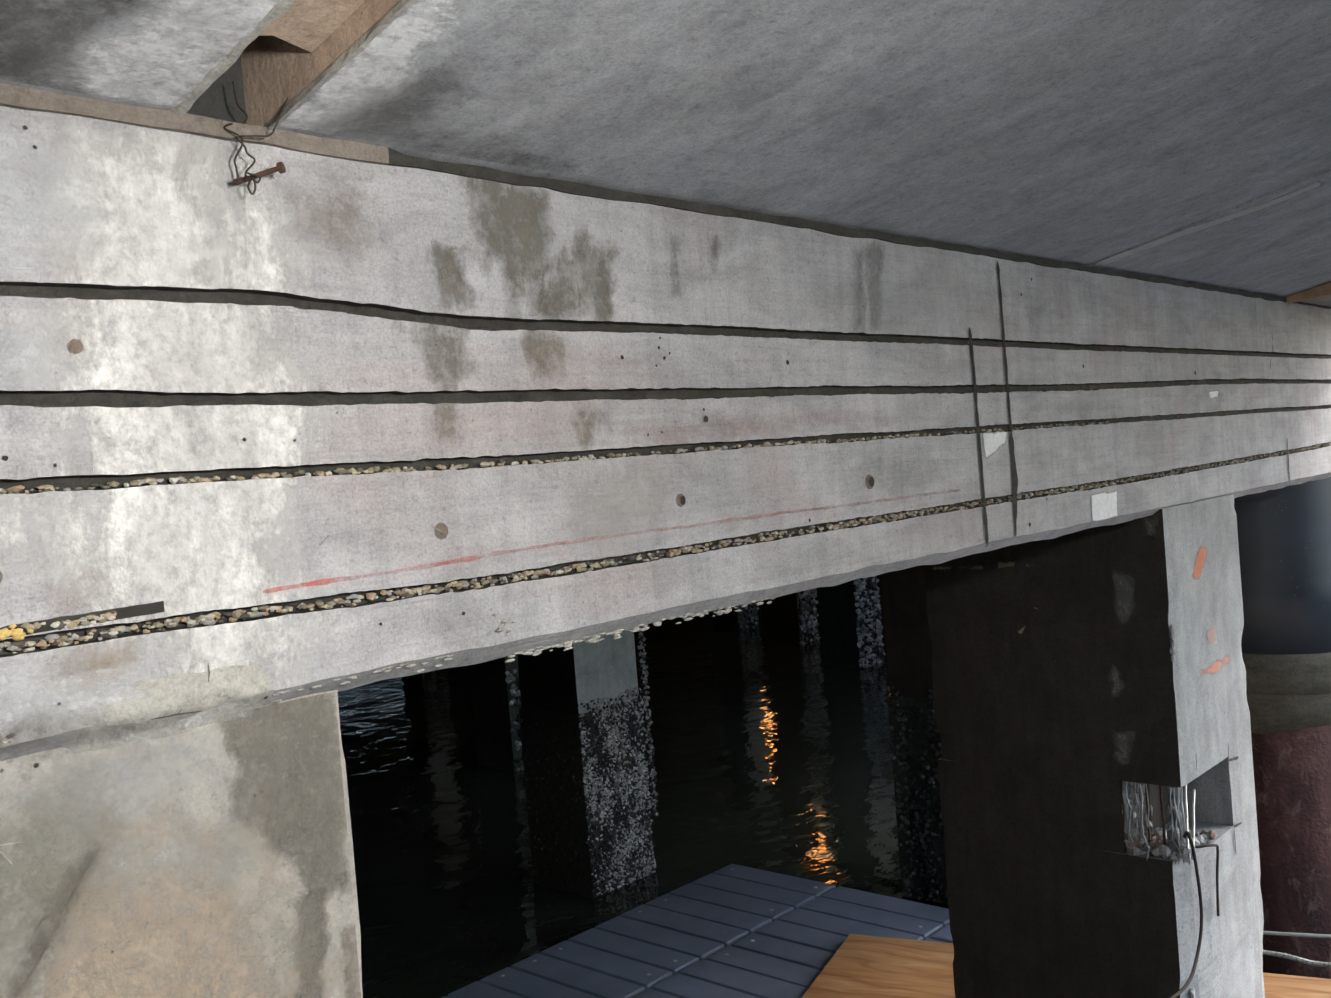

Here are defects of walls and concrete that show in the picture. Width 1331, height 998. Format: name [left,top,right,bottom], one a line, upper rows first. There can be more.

damp [439,252,465,303]
damp [467,178,612,321]
damp [428,324,462,380]
spalling [0,421,1109,494]
spalling [0,443,1331,662]
spalling [1122,781,1217,865]